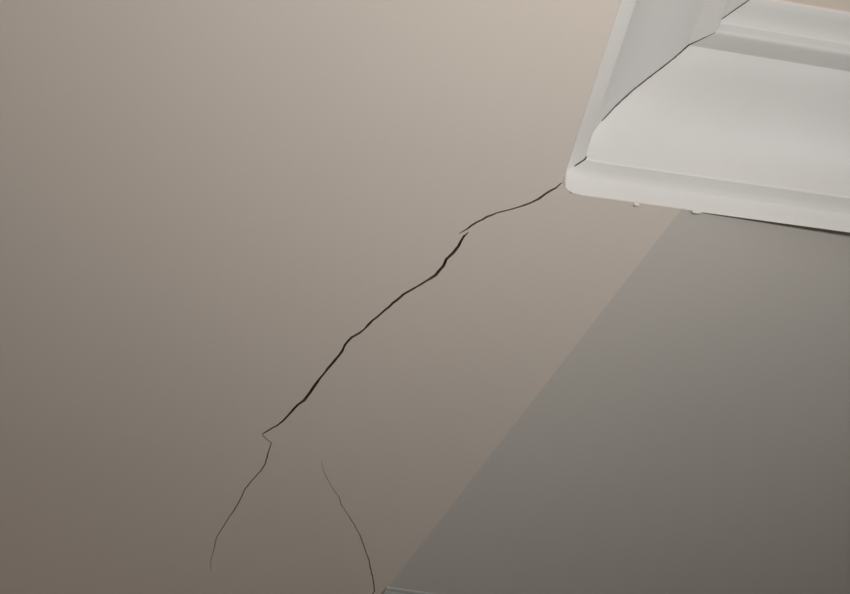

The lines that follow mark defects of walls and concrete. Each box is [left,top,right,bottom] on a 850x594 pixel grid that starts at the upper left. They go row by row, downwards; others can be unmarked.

crack [602,0,749,121]
crack [211,183,562,558]
crack [322,465,375,594]